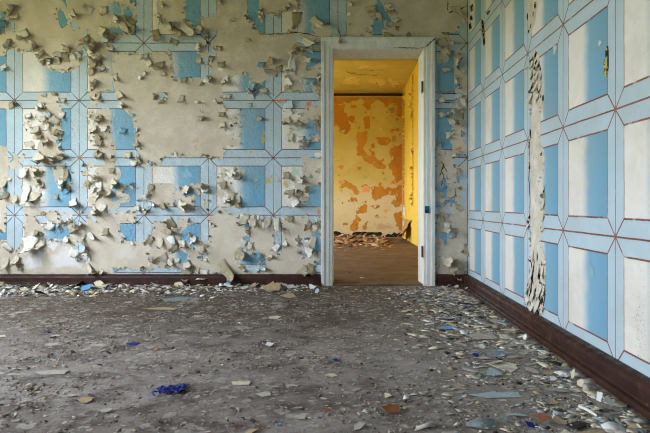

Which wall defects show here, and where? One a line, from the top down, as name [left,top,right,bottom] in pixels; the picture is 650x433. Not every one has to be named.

peeling [0,0,332,282]
peeling [334,0,490,281]
peeling [523,49,546,316]